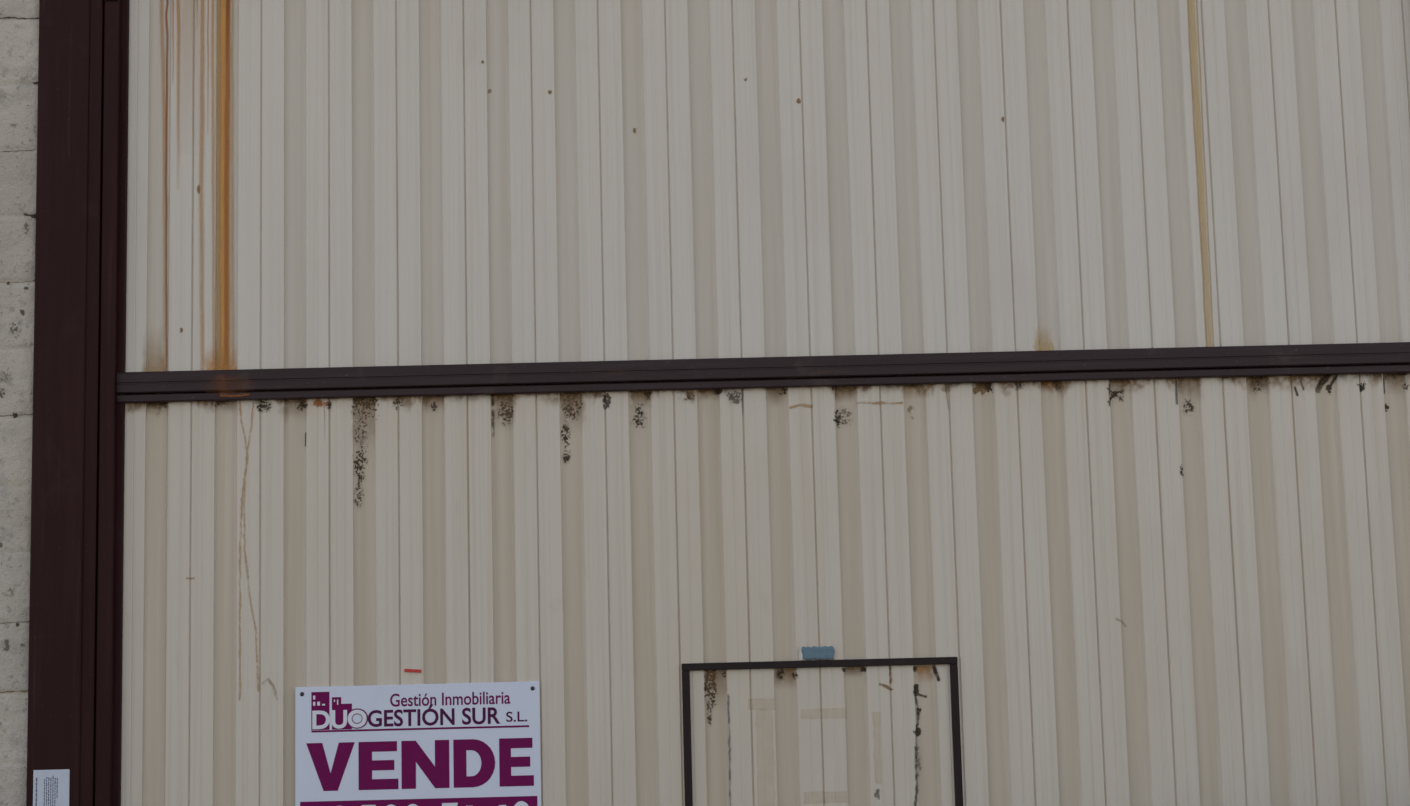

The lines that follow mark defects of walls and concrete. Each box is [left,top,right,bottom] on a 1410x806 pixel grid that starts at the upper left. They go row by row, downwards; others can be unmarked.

rust [161,0,180,371]
rust [200,0,236,370]
water stain [492,392,611,464]
water stain [631,391,659,428]
water stain [684,389,742,404]
water stain [973,381,1068,395]
water stain [1107,378,1201,412]
water stain [1224,375,1338,396]
water stain [1357,373,1408,412]
water stain [352,396,444,506]